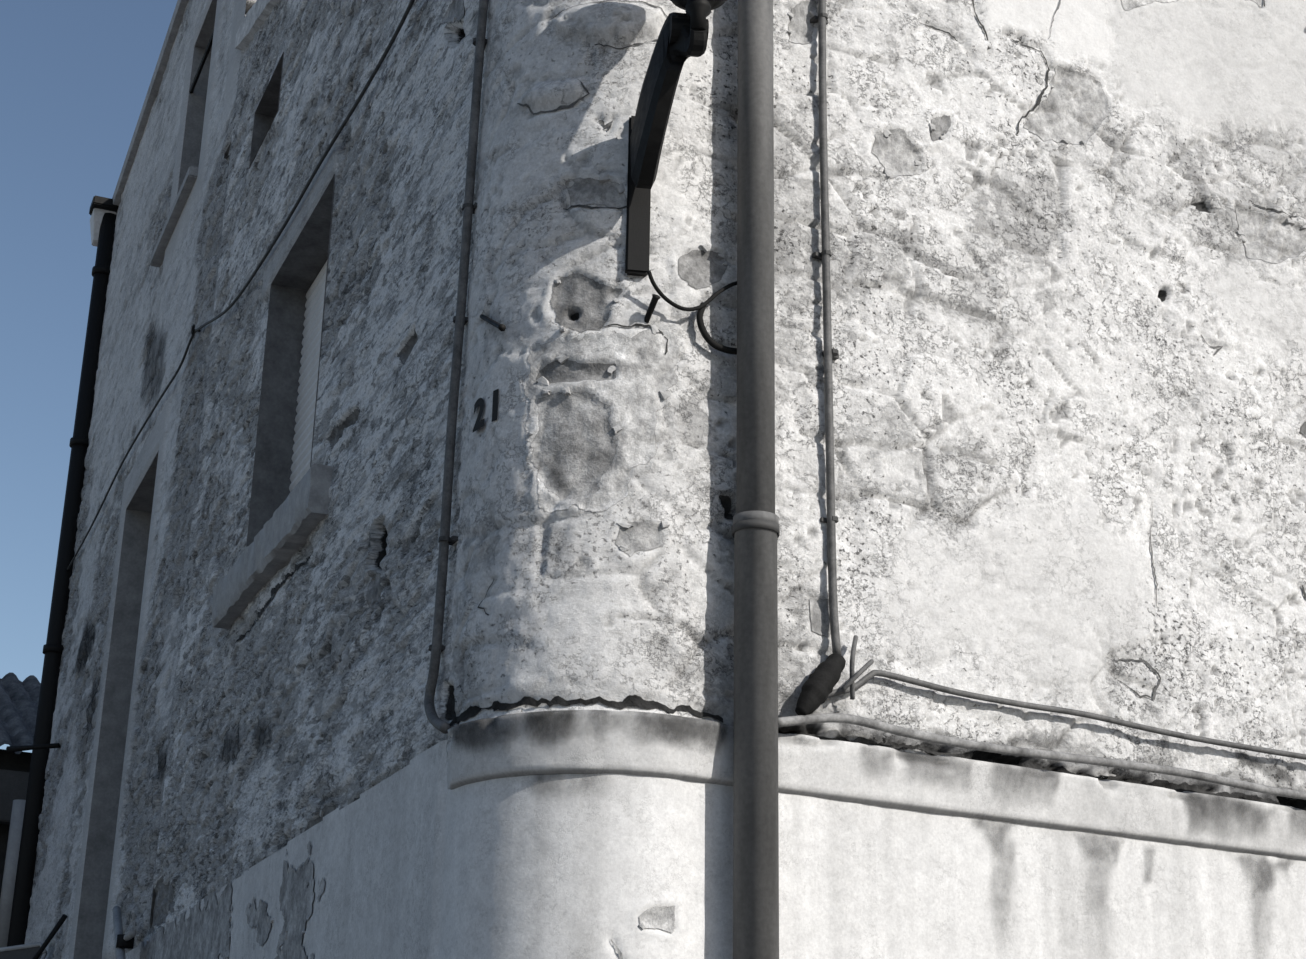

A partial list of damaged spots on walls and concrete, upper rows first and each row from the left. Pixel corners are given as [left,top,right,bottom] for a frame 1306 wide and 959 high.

crack [917,0,1061,134]
flaking render [929,115,951,141]
flaking render [872,128,922,178]
spalling [1190,202,1211,213]
flaking render [1236,207,1306,264]
flaking render [522,273,680,513]
flaking render [615,521,670,557]
spalling [445,685,456,720]
leakage [1185,796,1265,825]
peeling [140,804,340,959]
leakage [1242,858,1289,883]
flaking render [638,906,675,933]